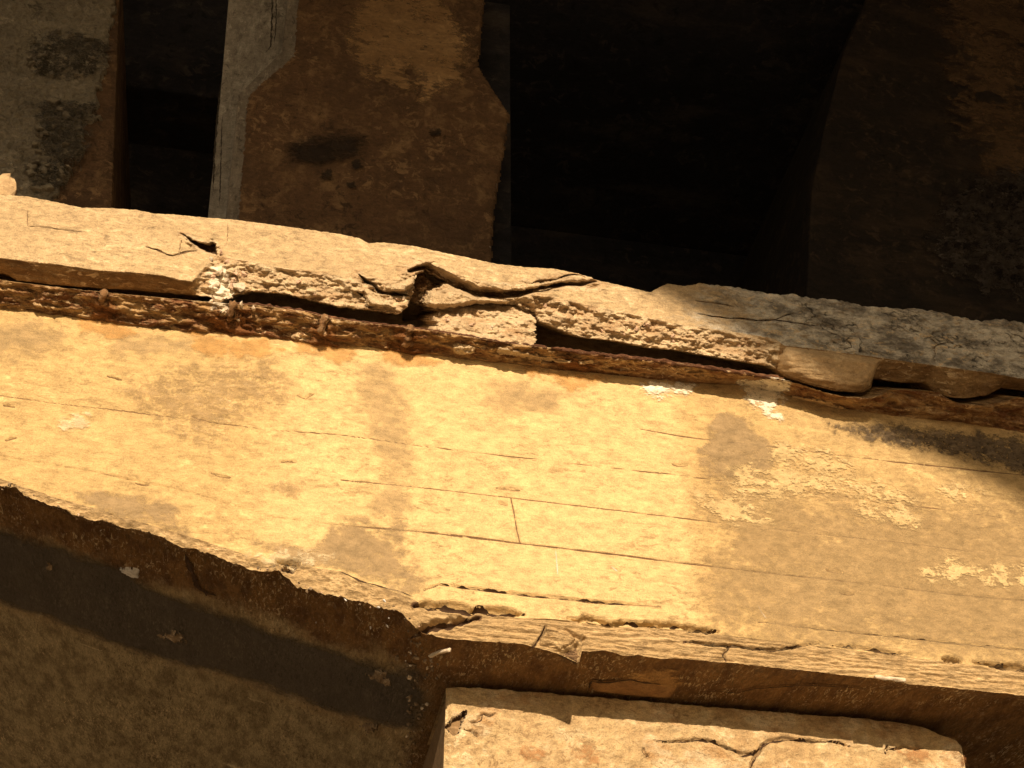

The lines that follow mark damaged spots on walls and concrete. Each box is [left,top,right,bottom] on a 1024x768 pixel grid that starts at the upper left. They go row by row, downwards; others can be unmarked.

crack [147,118,228,256]
crack [358,267,582,310]
corrosion [89,301,119,323]
corrosion [208,312,251,337]
corrosion [307,325,338,348]
corrosion [386,330,425,355]
peeling [237,272,784,381]
peeling [691,440,921,532]
damp [698,413,1024,672]
peeling [918,557,1024,590]
peeling [591,679,676,698]
crack [642,738,850,768]